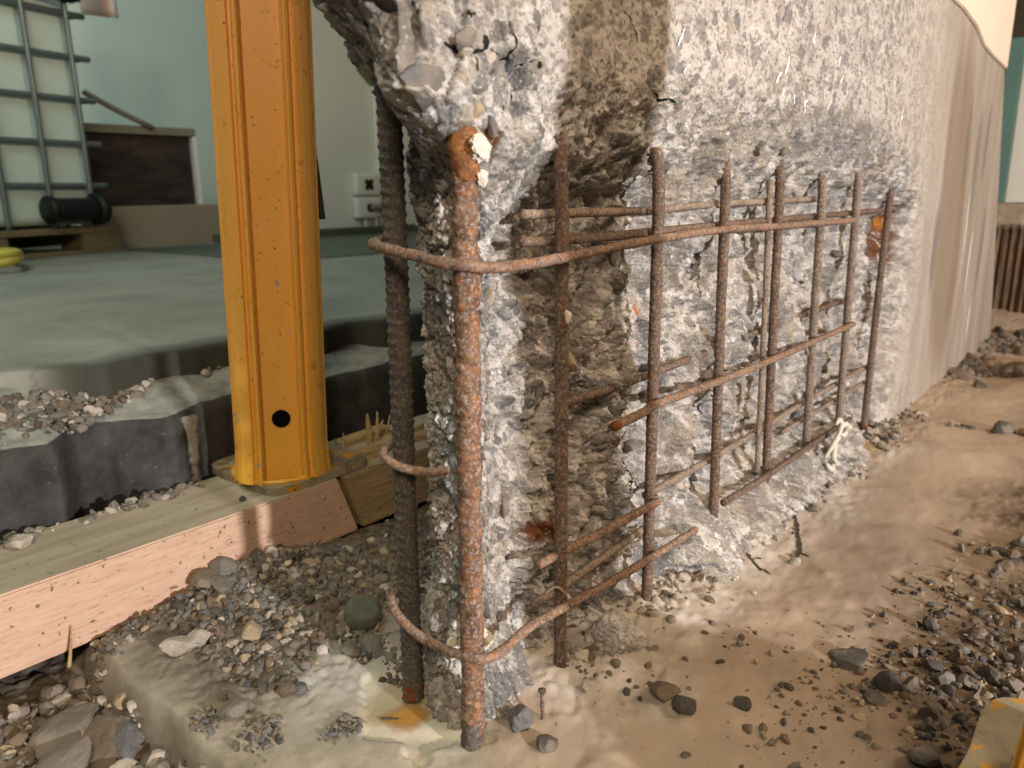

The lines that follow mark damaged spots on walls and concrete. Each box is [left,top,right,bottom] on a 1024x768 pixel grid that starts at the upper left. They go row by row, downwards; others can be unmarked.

corrosion [446,126,502,182]
corrosion [864,203,904,266]
spalling [311,0,920,730]
corrosion [518,516,555,544]
corrosion [371,686,429,728]